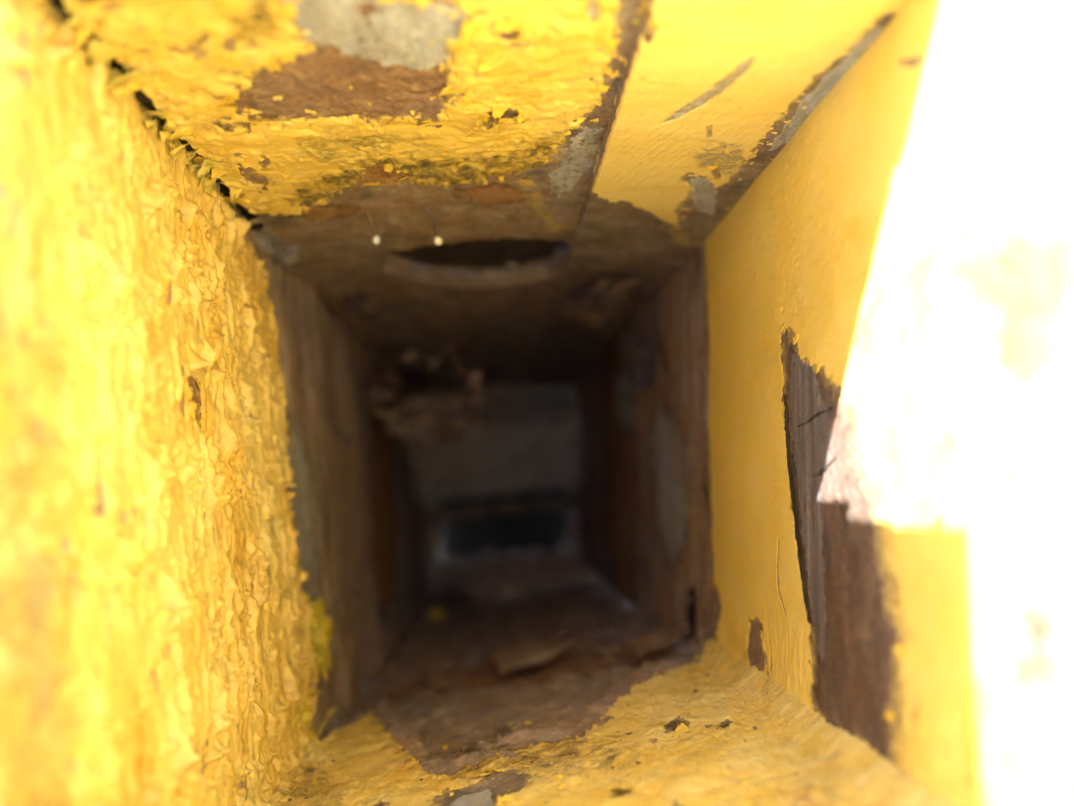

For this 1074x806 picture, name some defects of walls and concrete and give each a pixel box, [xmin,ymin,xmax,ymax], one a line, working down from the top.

crack [24,0,286,256]
peeling [168,27,255,59]
peeling [207,0,530,142]
peeling [779,322,905,766]
peeling [744,616,772,678]
peeling [1009,600,1070,695]